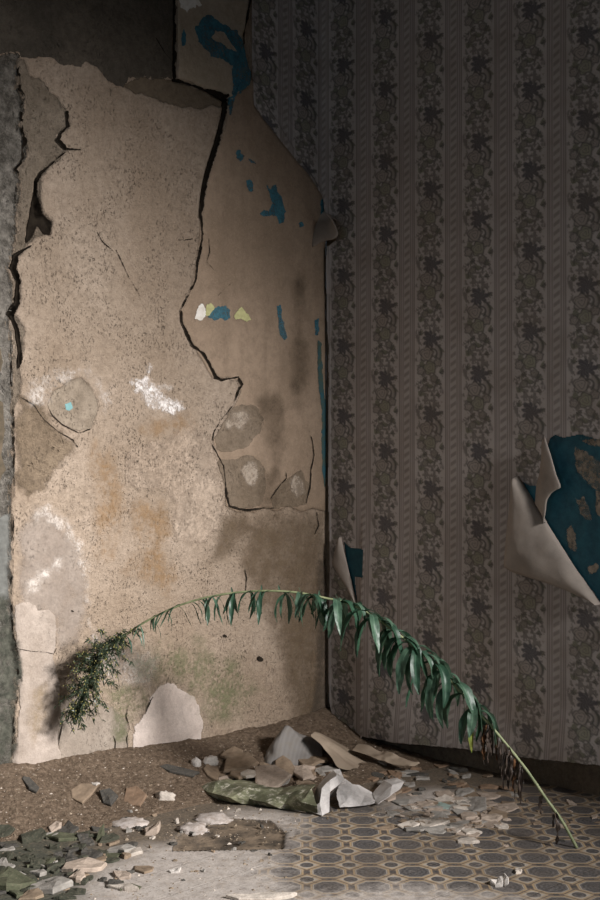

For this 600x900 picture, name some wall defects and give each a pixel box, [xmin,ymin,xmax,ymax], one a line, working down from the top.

crack [14,67,81,216]
spalling [124,77,238,115]
crack [156,0,287,511]
crack [10,516,19,675]
crack [7,245,32,485]
spalling [0,53,203,764]
water stain [132,366,183,415]
crack [306,435,319,534]
peeling [567,526,577,551]
peeling [574,438,600,520]